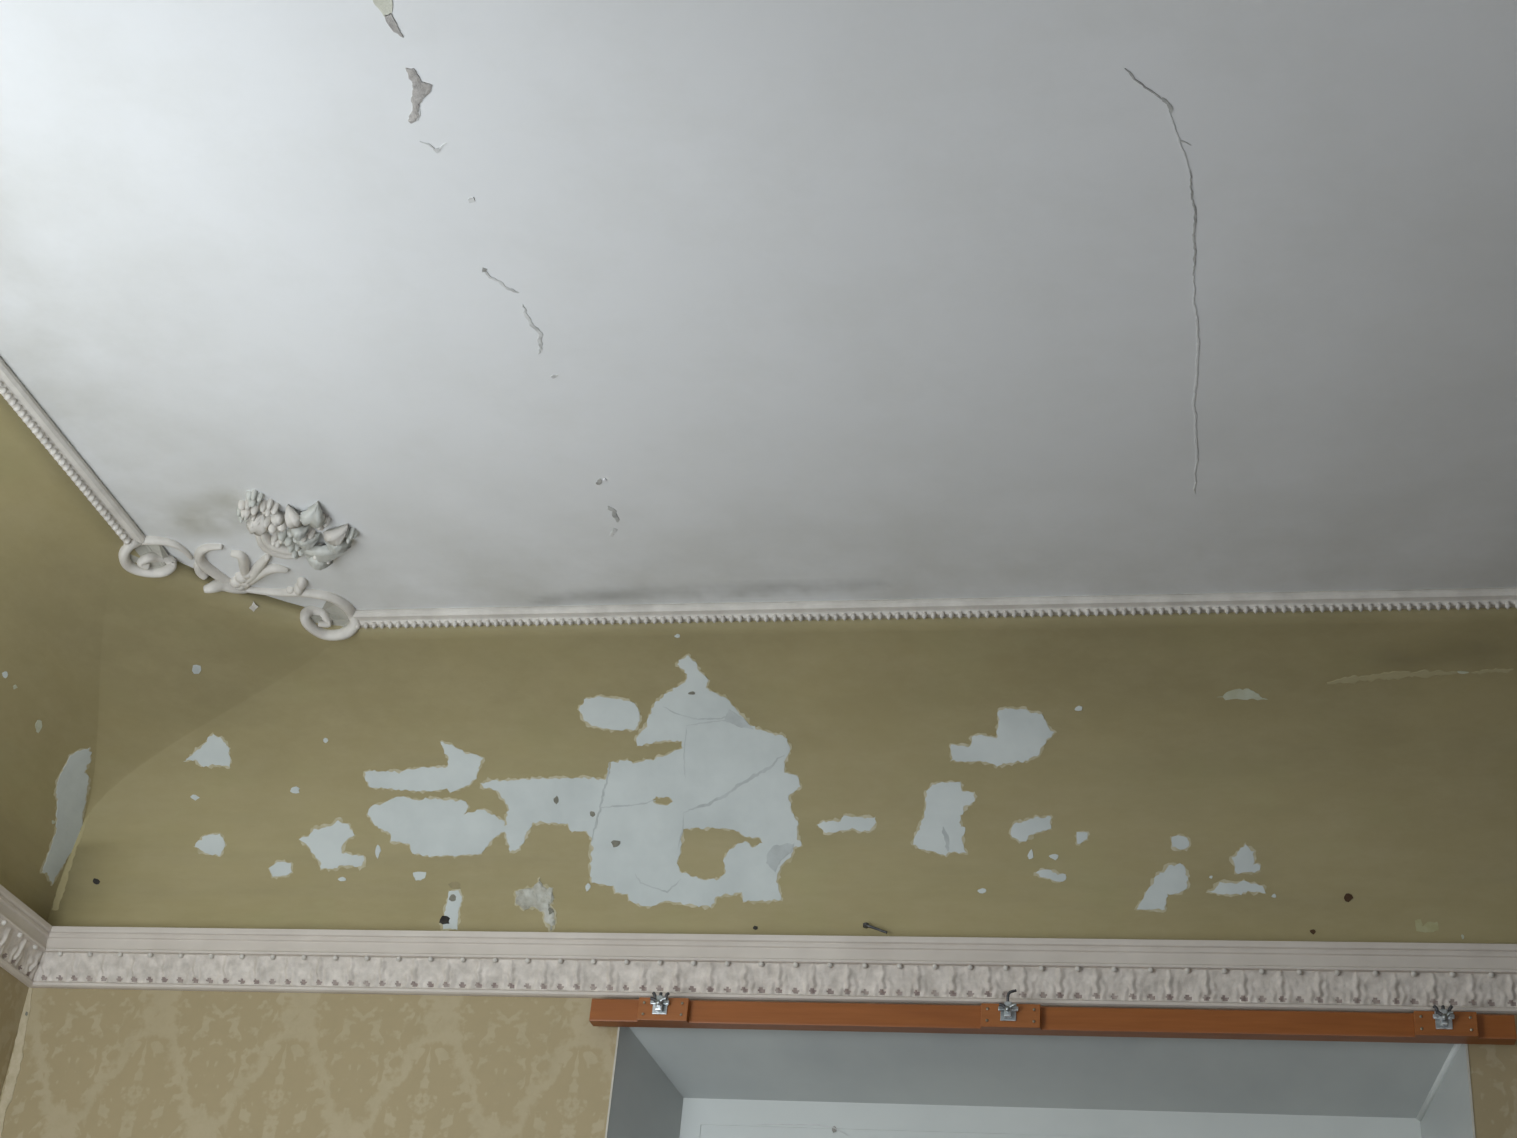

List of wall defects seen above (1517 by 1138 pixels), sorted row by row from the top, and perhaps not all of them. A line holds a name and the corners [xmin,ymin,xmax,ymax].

crack [373,0,446,153]
crack [1124,68,1200,494]
crack [482,267,558,379]
peeling [40,747,92,886]
peeling [183,732,232,769]
peeling [268,859,293,879]
peeling [299,653,803,910]
peeling [817,813,877,835]
peeling [910,780,978,857]
peeling [949,706,1057,768]
peeling [1008,815,1066,883]
peeling [1134,834,1276,913]